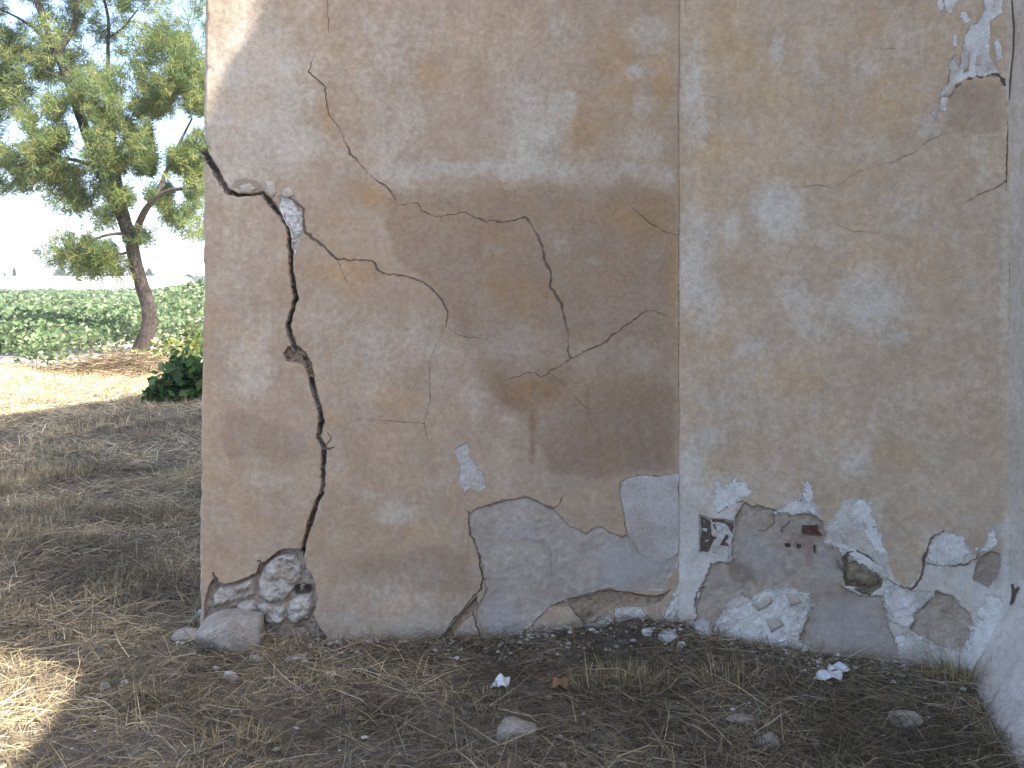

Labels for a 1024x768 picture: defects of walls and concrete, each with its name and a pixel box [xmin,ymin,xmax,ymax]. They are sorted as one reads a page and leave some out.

peeling [931,0,1006,120]
crack [308,62,637,380]
crack [199,146,449,554]
peeling [454,443,486,492]
spalling [204,548,328,638]
spalling [441,596,478,637]
spalling [541,583,679,631]
spalling [695,477,1003,671]